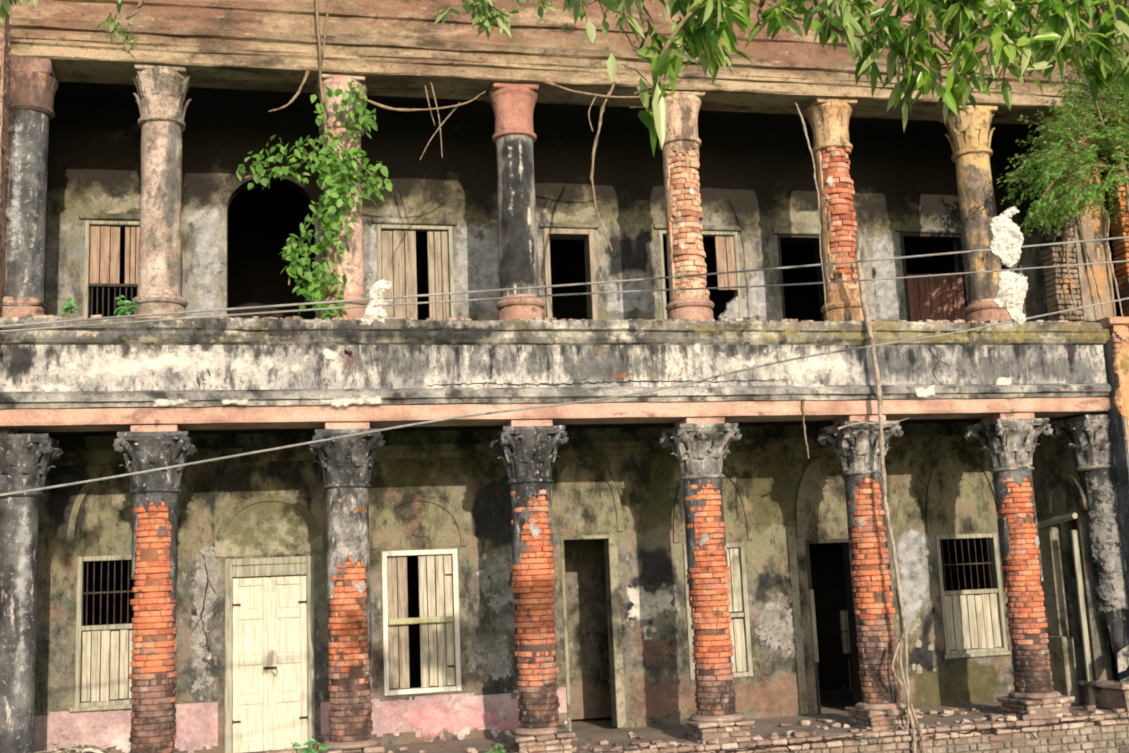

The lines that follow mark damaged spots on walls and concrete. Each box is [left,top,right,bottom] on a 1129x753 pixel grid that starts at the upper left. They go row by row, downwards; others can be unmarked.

damp [501,138,534,284]
damp [605,229,651,277]
spalling [607,146,1012,323]
damp [6,344,59,382]
damp [269,323,657,380]
damp [46,465,89,540]
spalling [108,485,220,717]
damp [472,474,512,553]
spalling [466,489,559,687]
spalling [622,475,798,720]
spalling [848,475,934,638]
spalling [997,462,1049,650]